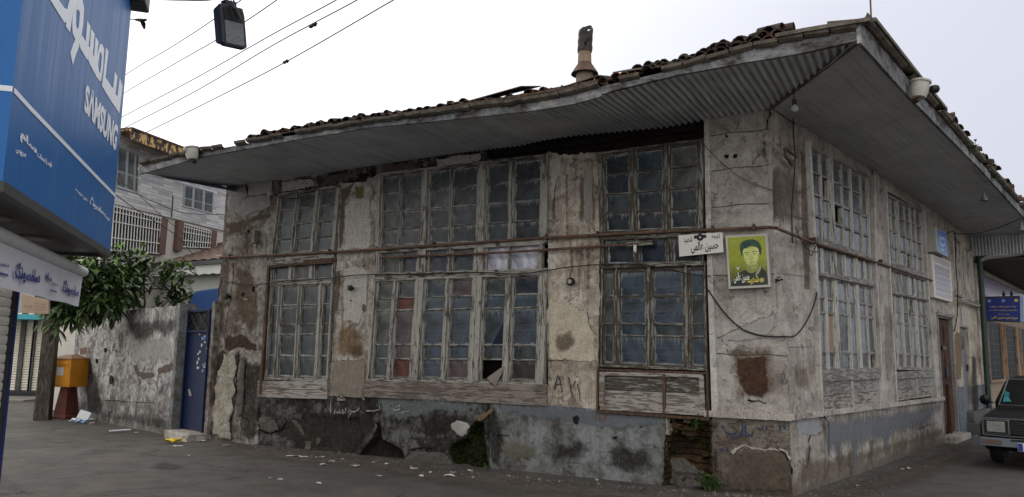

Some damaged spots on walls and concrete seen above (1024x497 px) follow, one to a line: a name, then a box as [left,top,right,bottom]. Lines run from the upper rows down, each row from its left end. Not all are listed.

peeling [436,153,481,166]
water stain [130,319,176,339]
water stain [339,303,362,356]
peeling [211,334,256,439]
flaking render [259,416,404,459]
flaking render [449,408,493,469]
water stain [554,442,582,458]
water stain [611,447,650,472]
flaking render [662,414,714,488]